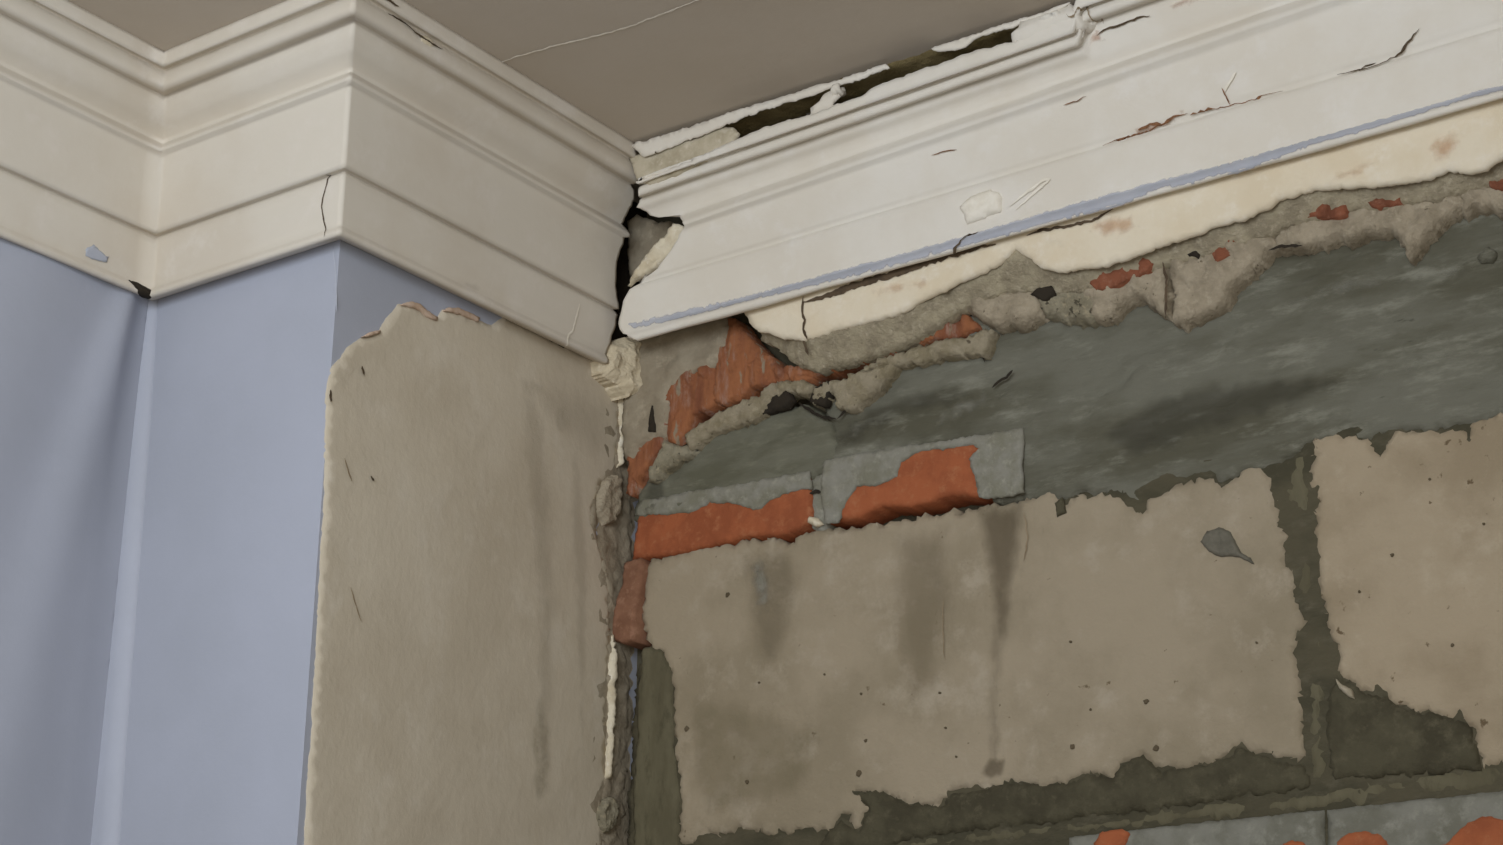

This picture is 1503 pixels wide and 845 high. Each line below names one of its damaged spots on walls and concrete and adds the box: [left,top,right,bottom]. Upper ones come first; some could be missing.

peeling [725,4,1098,138]
crack [1337,29,1419,75]
crack [1103,89,1281,146]
crack [321,175,331,235]
crack [628,223,684,287]
peeling [304,161,1503,845]